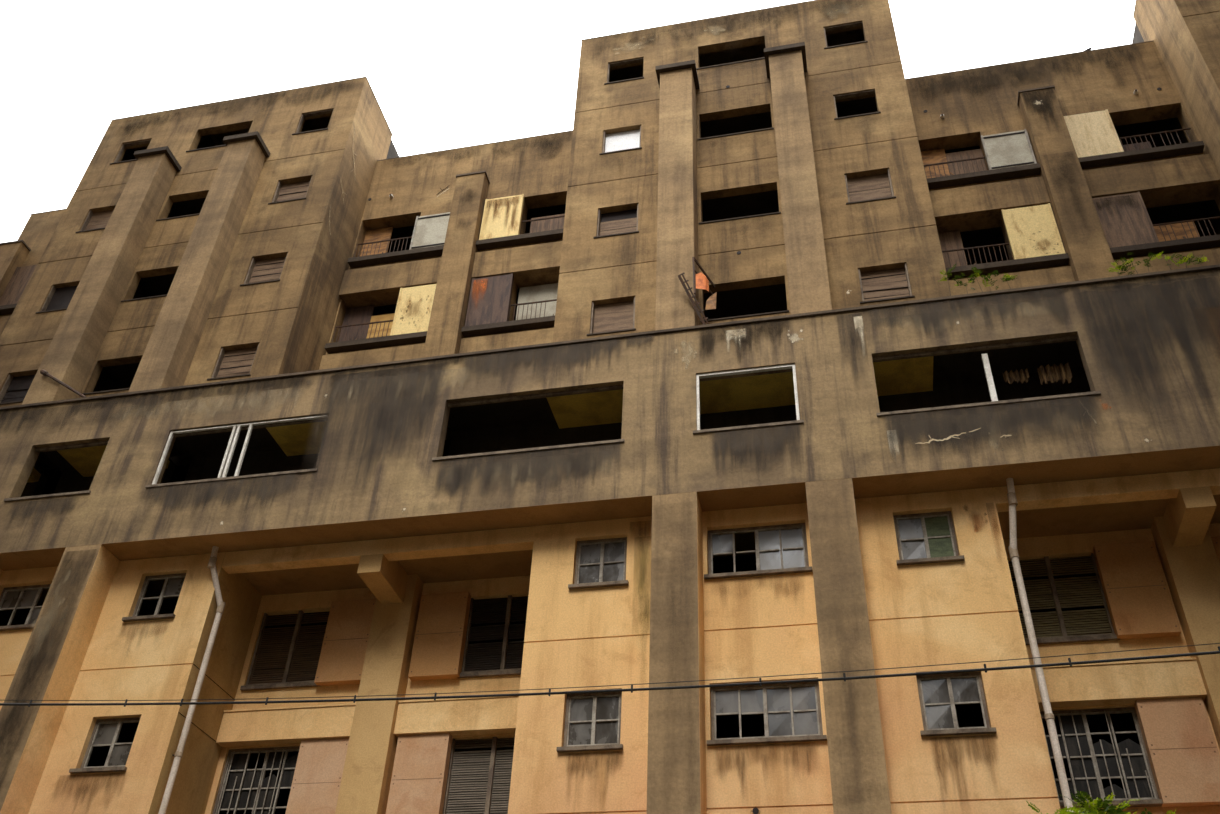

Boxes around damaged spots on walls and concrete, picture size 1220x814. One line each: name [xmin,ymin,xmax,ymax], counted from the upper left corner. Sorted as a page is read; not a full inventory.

damp [915,44,1138,114]
damp [702,319,786,351]
damp [847,269,1220,376]
damp [75,375,305,409]
damp [329,337,630,437]
crack [915,428,1012,444]